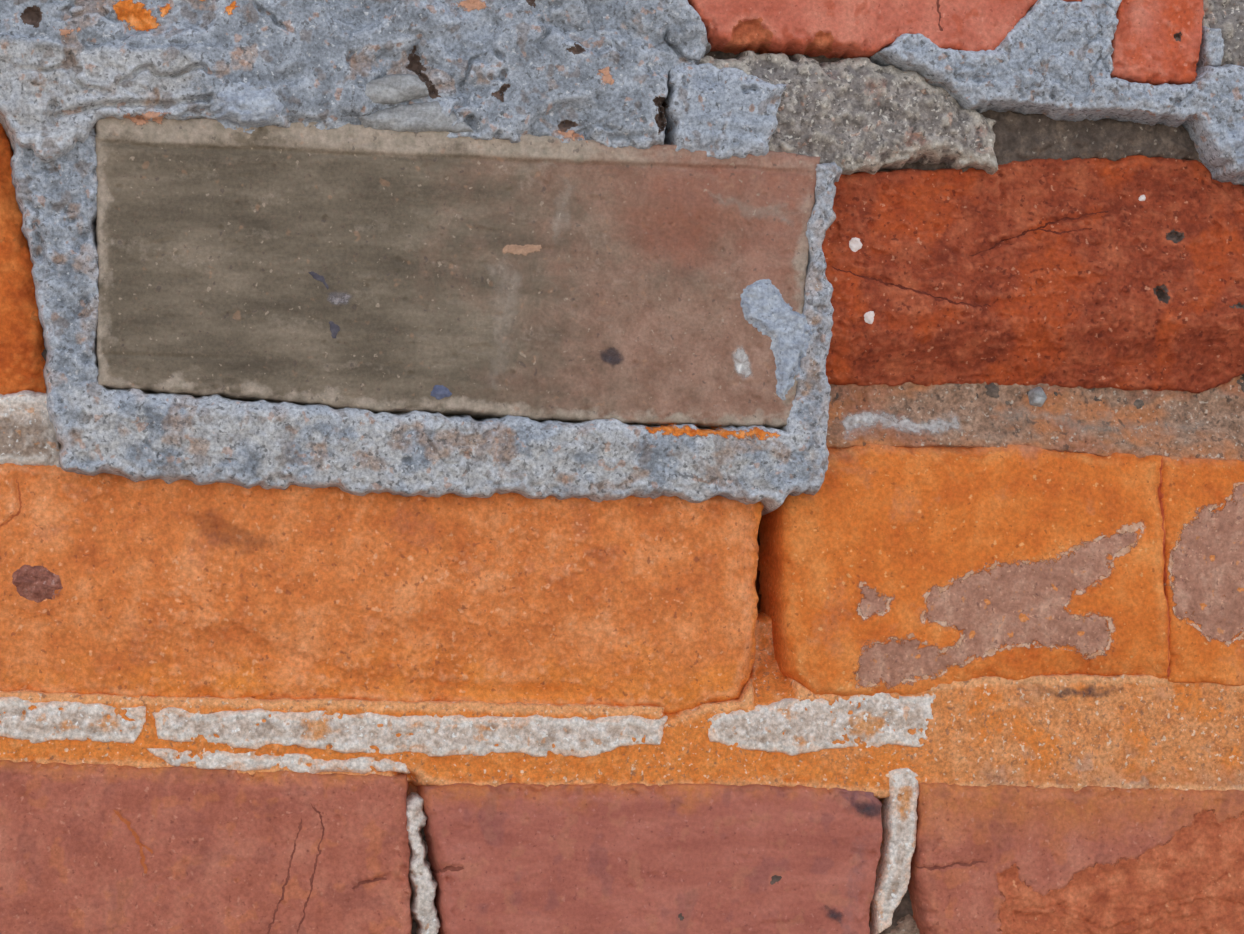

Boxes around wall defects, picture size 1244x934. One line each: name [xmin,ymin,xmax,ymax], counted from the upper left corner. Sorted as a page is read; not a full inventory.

crack [935,0,943,31]
crack [0,480,22,527]
peeling [854,522,1146,689]
peeling [1164,482,1244,647]
crack [267,804,325,934]
spalling [996,809,1244,934]